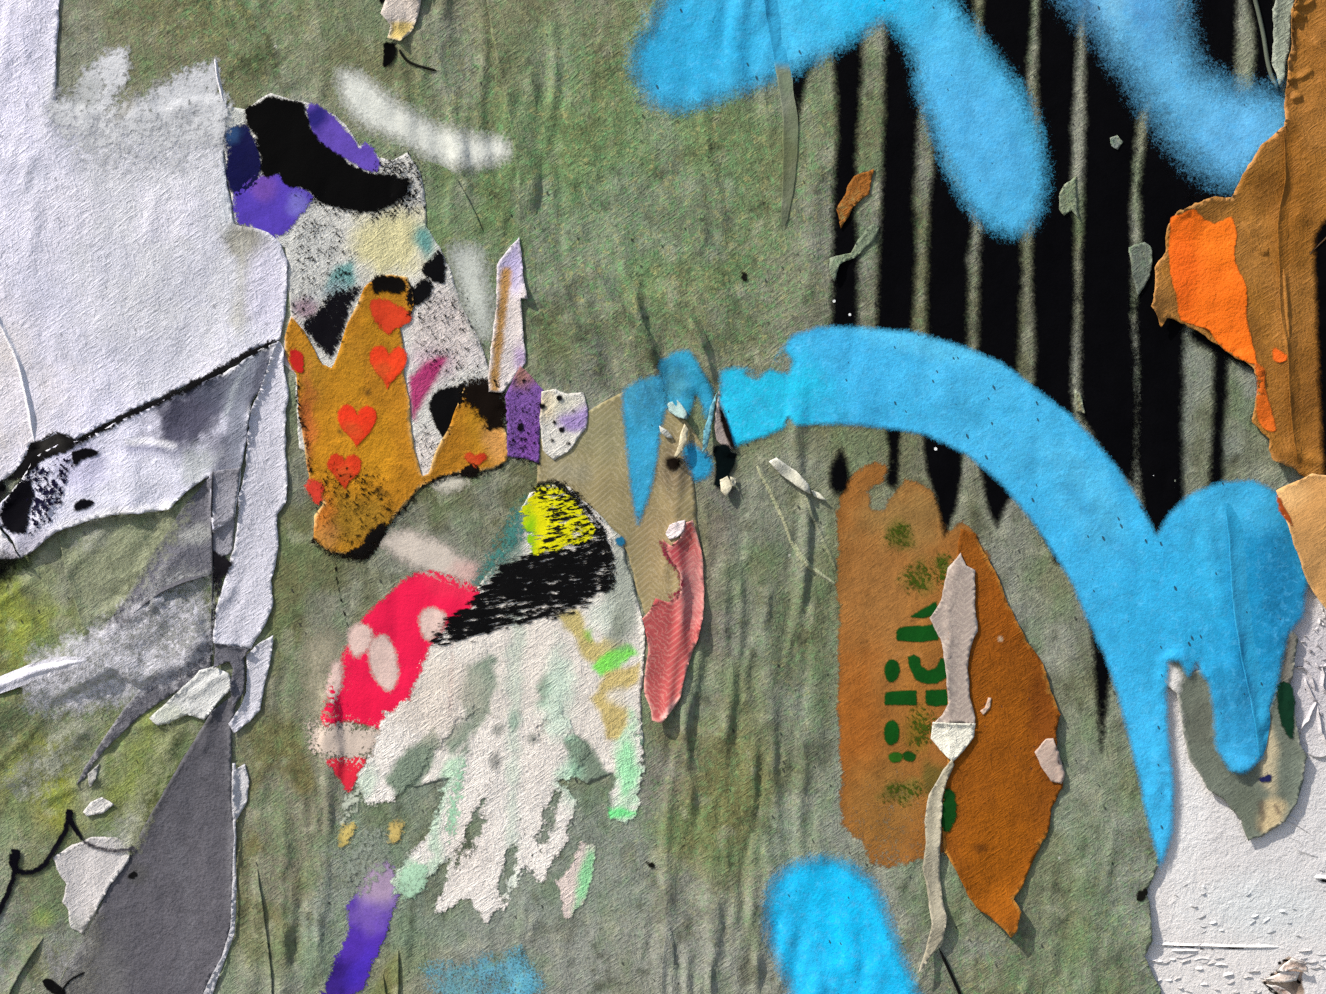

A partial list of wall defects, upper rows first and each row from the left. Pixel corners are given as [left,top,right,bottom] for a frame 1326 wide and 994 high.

peeling [1260,957,1308,994]